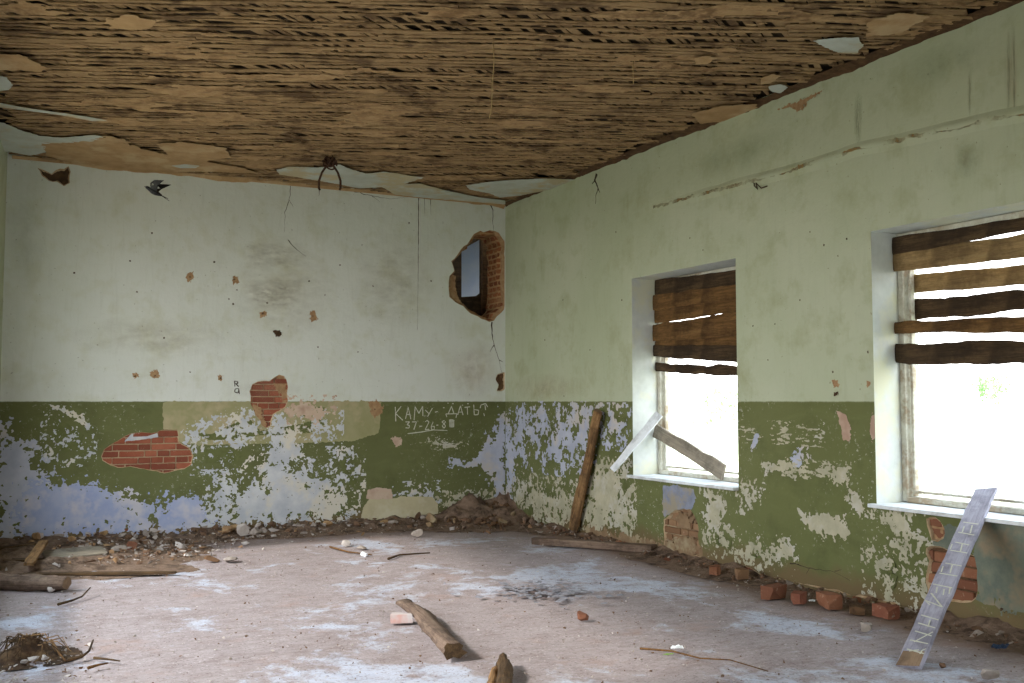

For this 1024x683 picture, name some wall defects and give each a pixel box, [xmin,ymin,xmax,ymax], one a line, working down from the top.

spalling [743,0,1024,113]
spalling [12,155,542,209]
spalling [561,122,719,179]
spalling [449,230,505,322]
peeling [0,375,366,540]
peeling [392,401,957,611]